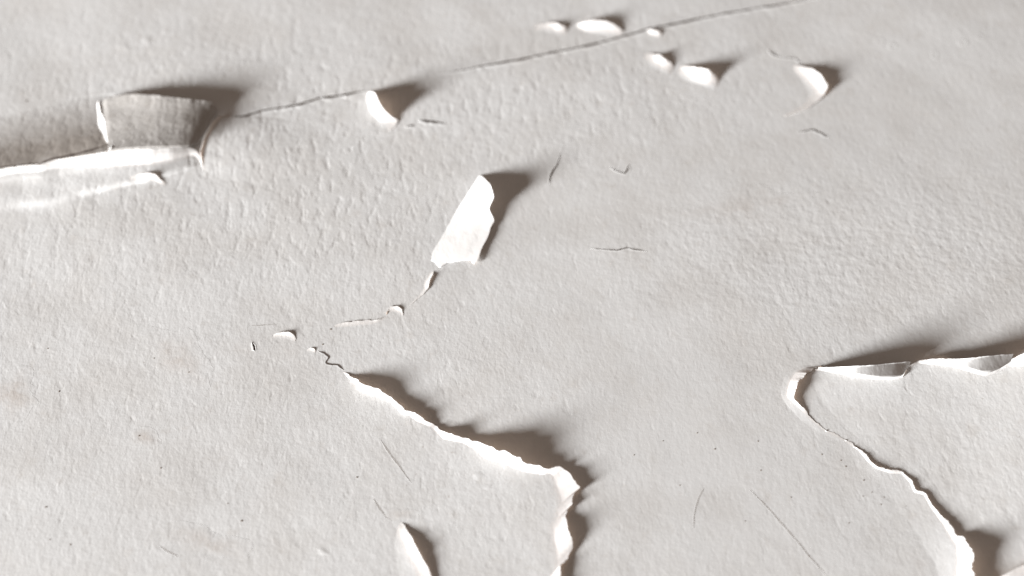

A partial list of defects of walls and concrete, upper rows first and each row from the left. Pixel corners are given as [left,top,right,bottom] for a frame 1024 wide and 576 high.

peeling [535,20,624,36]
crack [437,0,809,75]
crack [227,89,372,117]
peeling [366,92,398,131]
peeling [644,53,720,90]
peeling [785,65,828,117]
peeling [0,94,334,225]
peeling [334,176,494,327]
peeling [273,332,296,341]
peeling [237,372,580,576]
peeling [781,353,1024,576]